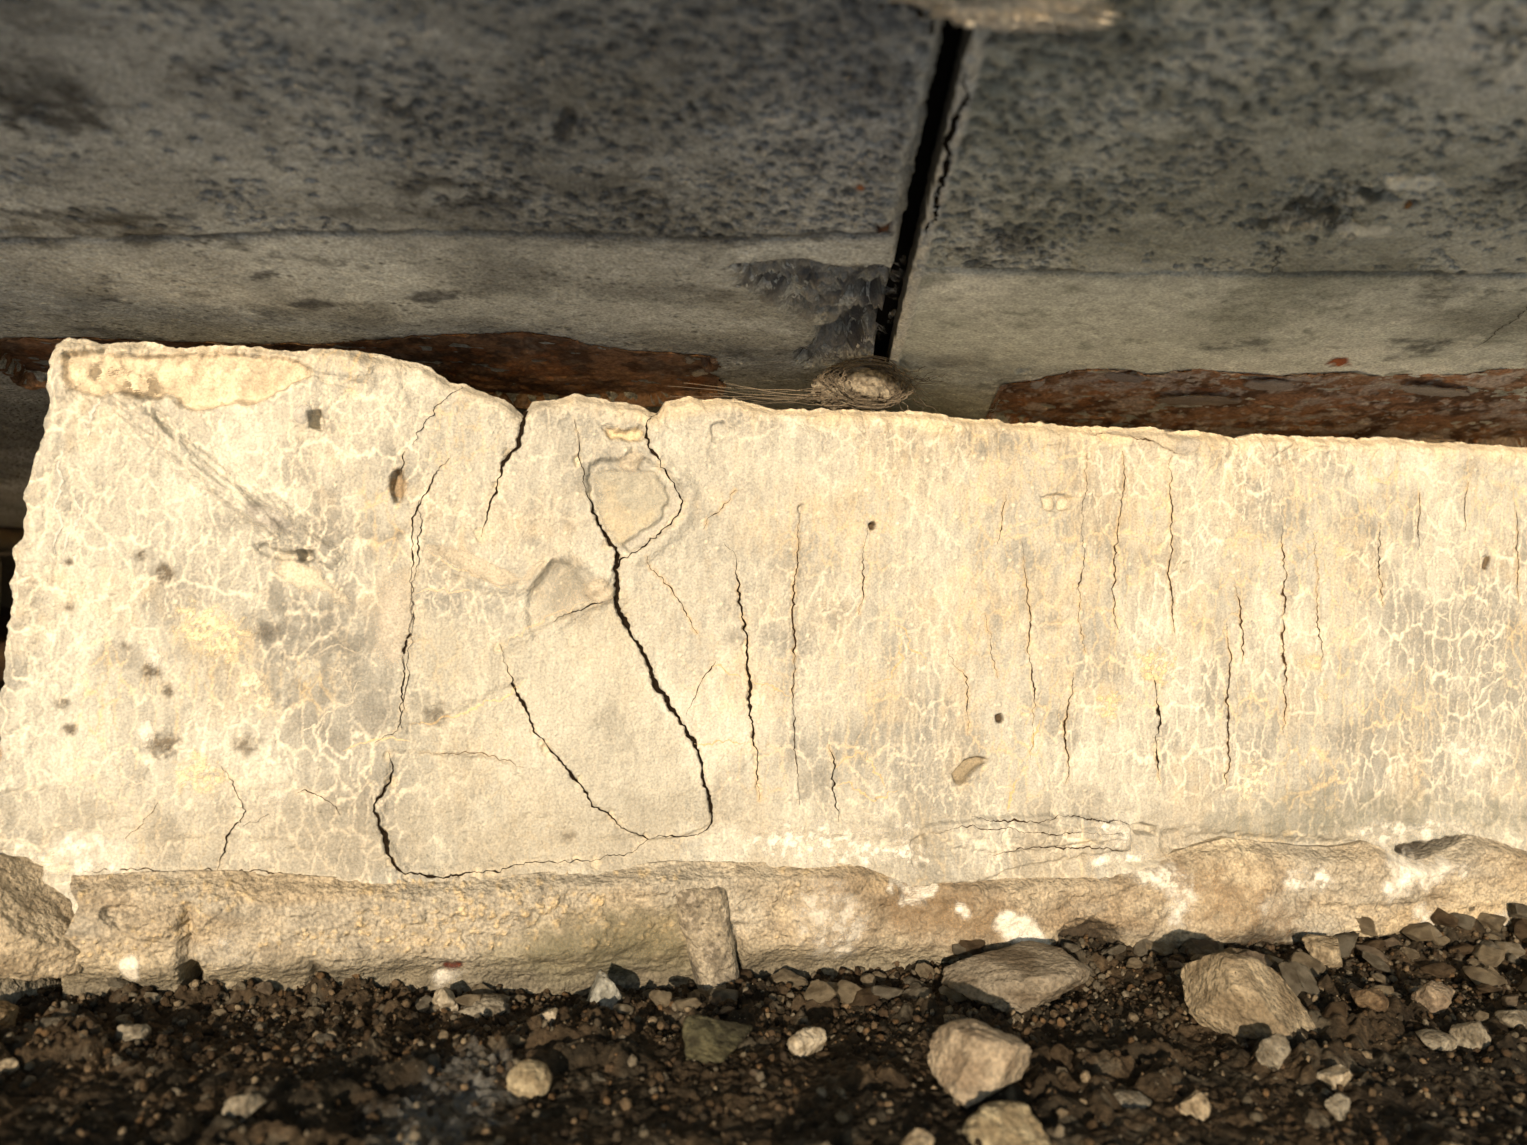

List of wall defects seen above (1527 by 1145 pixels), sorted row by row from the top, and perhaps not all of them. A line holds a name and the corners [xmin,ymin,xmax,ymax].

crack [925,70,975,235]
corrosion [0,331,726,409]
corrosion [986,358,1527,448]
crack [292,389,896,879]
crack [858,433,1177,855]
crack [1224,587,1244,785]
crack [1265,459,1323,733]
crack [1356,451,1383,603]
crack [84,804,159,873]
crack [204,767,337,880]